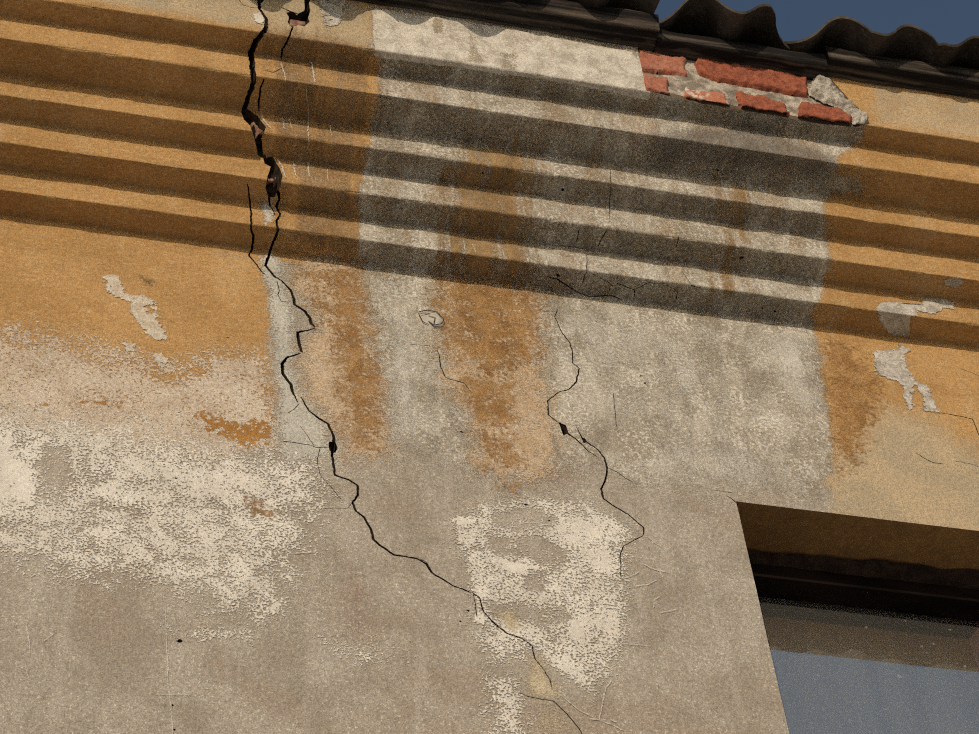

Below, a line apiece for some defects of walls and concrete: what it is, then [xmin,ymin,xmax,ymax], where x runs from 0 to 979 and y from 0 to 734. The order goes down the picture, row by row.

peeling [317,0,347,27]
peeling [372,9,870,127]
crack [547,170,700,300]
peeling [0,273,286,469]
leakage [0,250,346,647]
crack [239,0,622,734]
leakage [259,6,864,734]
crack [542,309,676,613]
peeling [872,298,955,413]